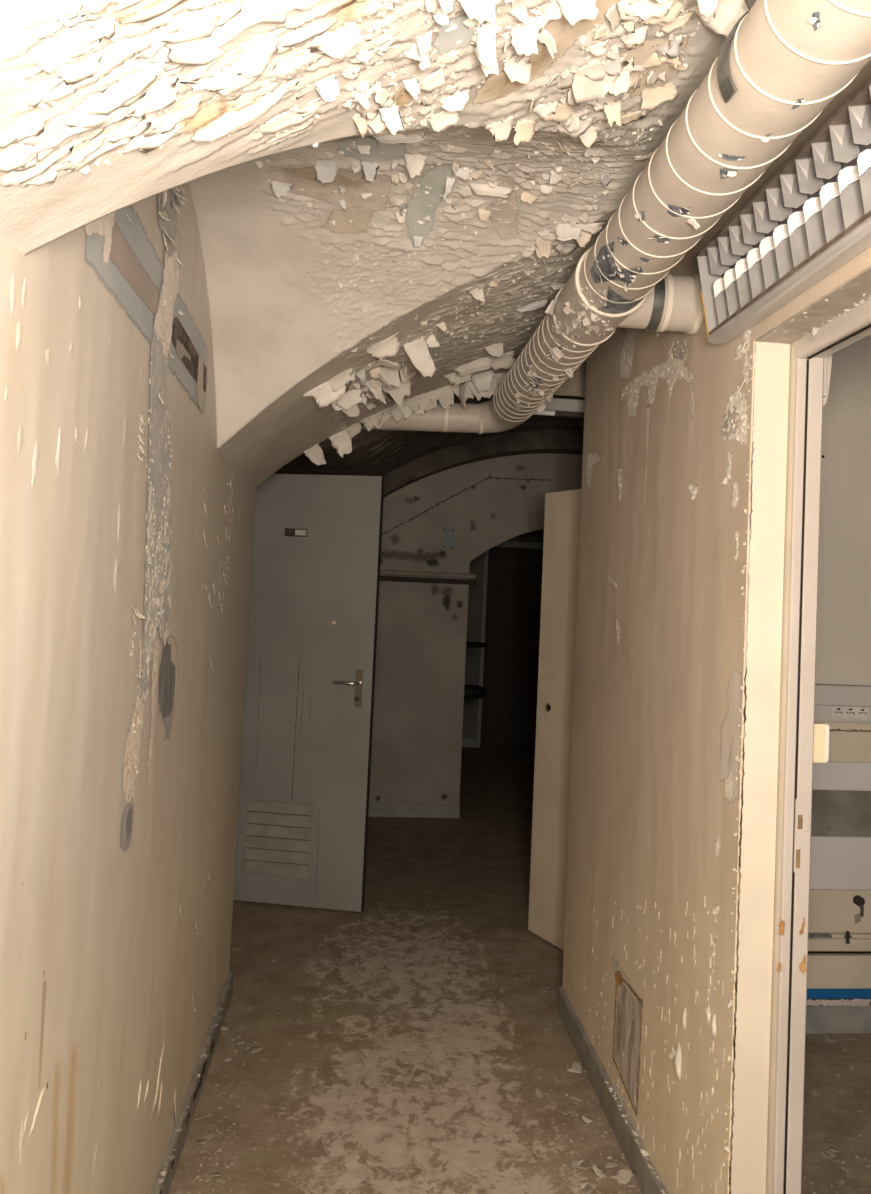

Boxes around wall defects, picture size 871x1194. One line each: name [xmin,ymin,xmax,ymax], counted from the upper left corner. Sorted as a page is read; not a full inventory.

flaking render [0,0,751,509]